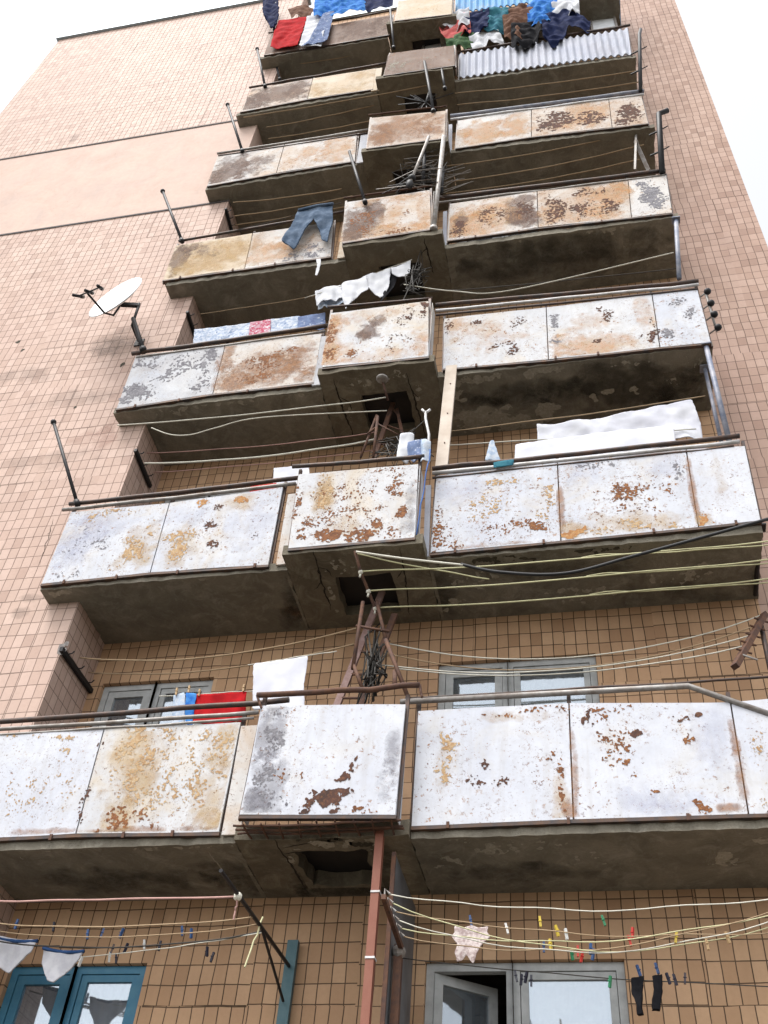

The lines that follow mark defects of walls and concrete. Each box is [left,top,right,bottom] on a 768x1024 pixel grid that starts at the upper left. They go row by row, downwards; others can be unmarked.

corrosion [536,101,645,132]
corrosion [450,187,622,237]
corrosion [214,346,313,391]
corrosion [296,504,408,542]
corrosion [432,501,464,549]
corrosion [481,491,588,541]
corrosion [689,482,715,526]
crack [313,551,331,609]
corrosion [299,755,358,814]
corrosion [94,806,160,833]
spalling [231,804,404,863]
corrosion [562,803,576,816]